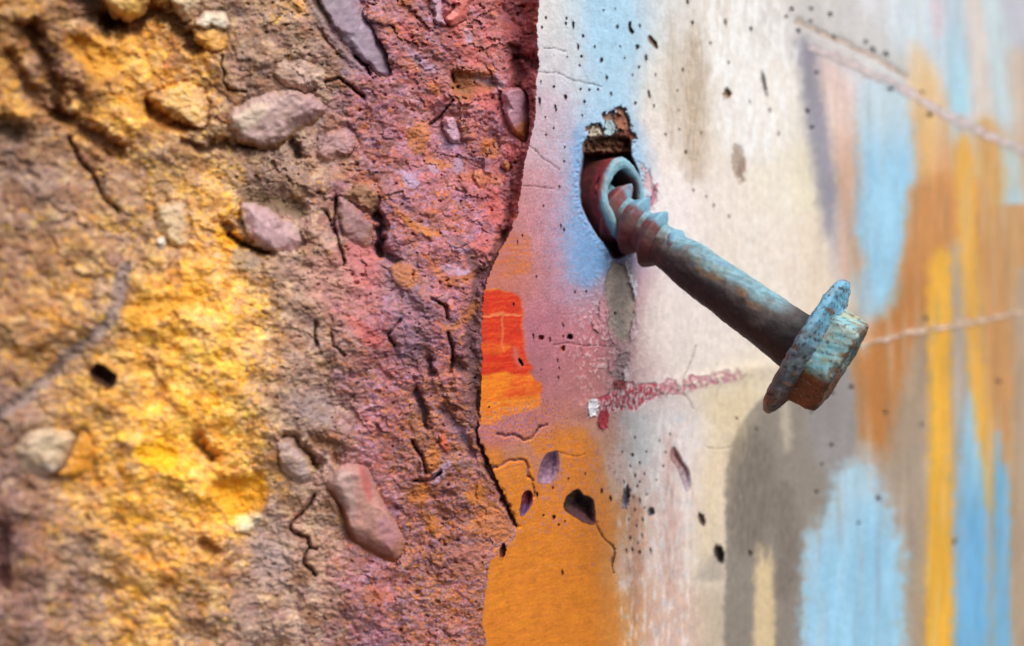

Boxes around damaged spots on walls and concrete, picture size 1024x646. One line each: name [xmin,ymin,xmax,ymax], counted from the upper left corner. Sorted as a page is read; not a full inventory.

spalling [586,107,636,142]
spalling [0,0,559,646]
crack [476,394,542,517]
crack [289,494,317,576]